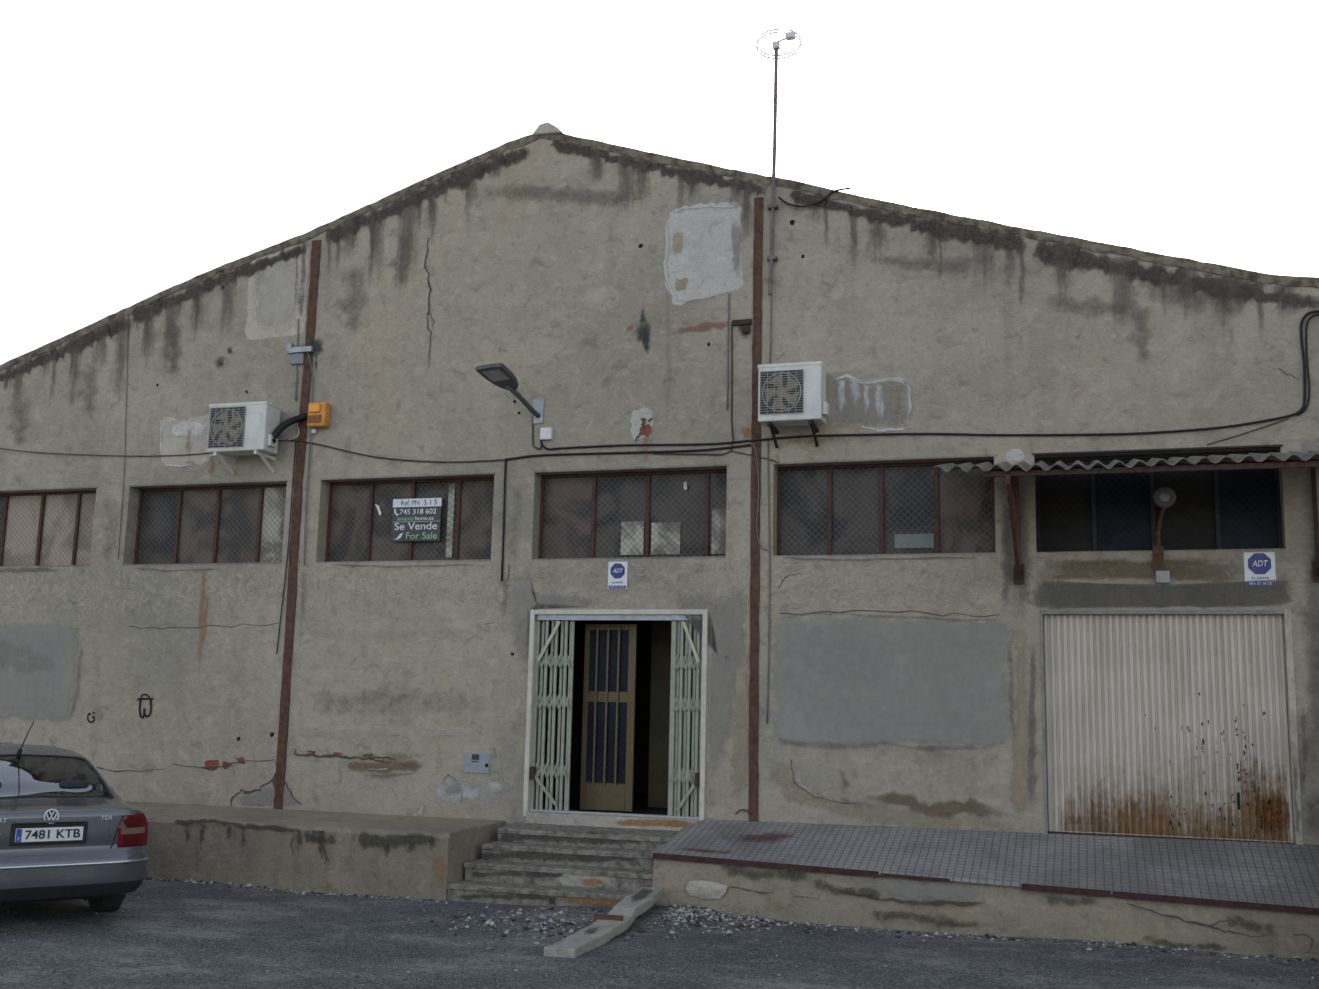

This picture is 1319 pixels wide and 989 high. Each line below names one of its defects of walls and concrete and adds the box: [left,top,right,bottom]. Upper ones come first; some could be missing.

damp [326,148,527,253]
damp [552,140,762,213]
damp [791,190,1319,319]
damp [0,243,305,390]
damp [311,340,322,365]
crack [424,238,435,368]
flaking render [630,407,653,451]
flaking render [202,757,245,771]
crack [96,749,395,807]
corrosion [1064,770,1289,841]